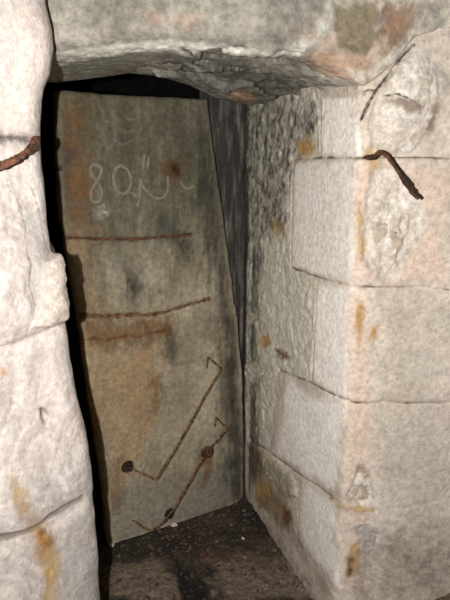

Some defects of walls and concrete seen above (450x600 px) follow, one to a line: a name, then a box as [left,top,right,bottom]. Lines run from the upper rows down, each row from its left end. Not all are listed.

crack [360,44,415,120]
rust [39,530,58,600]
rust [348,545,359,575]